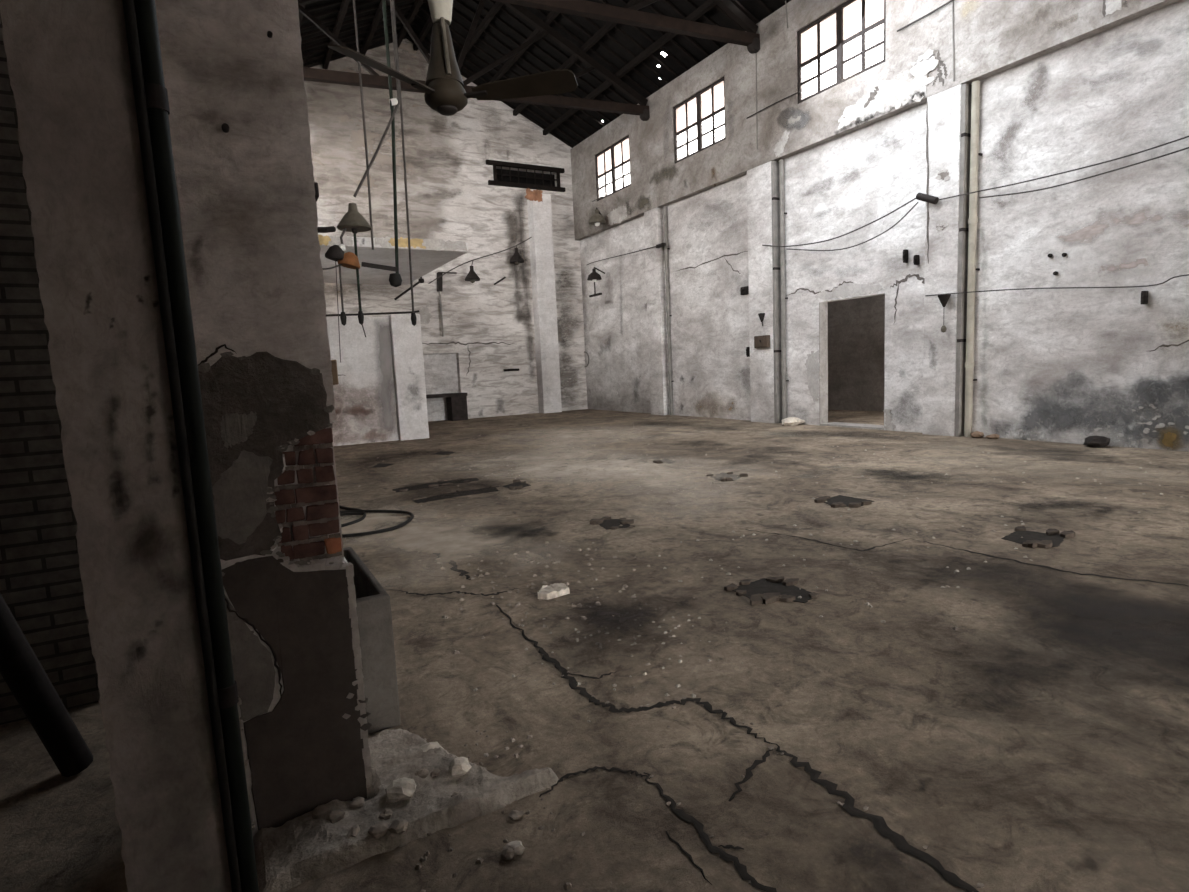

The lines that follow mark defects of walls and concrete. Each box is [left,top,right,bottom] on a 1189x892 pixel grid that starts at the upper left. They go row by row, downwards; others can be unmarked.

crack [1150,340,1189,352]
water stain [995,375,1189,459]
flaking render [198,352,374,798]
flaking render [237,696,256,831]
crack [390,551,985,892]